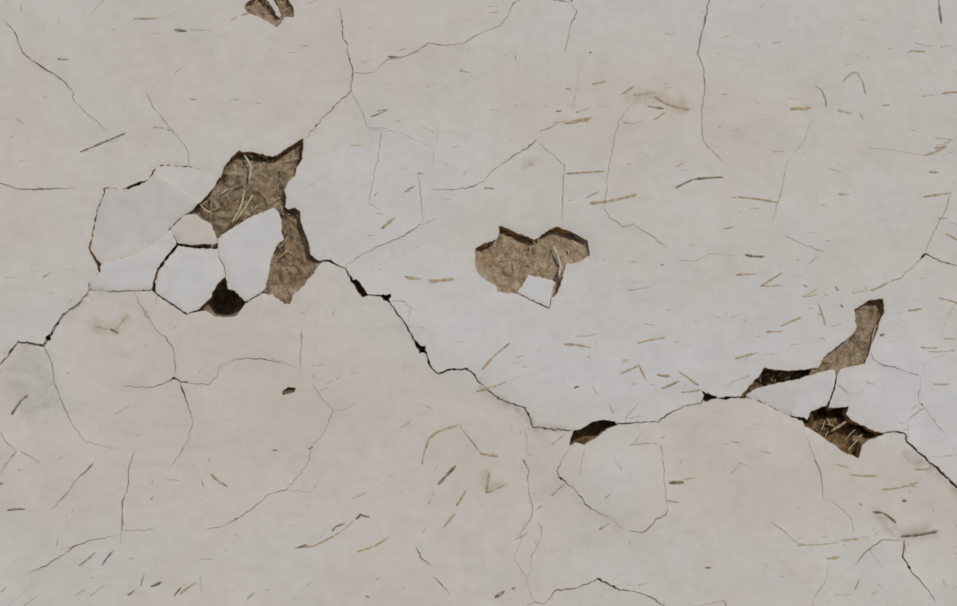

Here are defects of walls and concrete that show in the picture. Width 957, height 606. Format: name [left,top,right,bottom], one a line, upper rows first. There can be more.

crack [3,19,105,129]
spalling [245,0,294,27]
crack [307,0,518,209]
spalling [89,140,331,317]
spalling [474,227,589,309]
crack [0,289,148,606]
crack [122,295,302,469]
crack [330,140,664,606]
hole [570,420,615,444]
crack [556,392,743,533]
spalling [741,300,882,457]
crack [872,356,957,488]